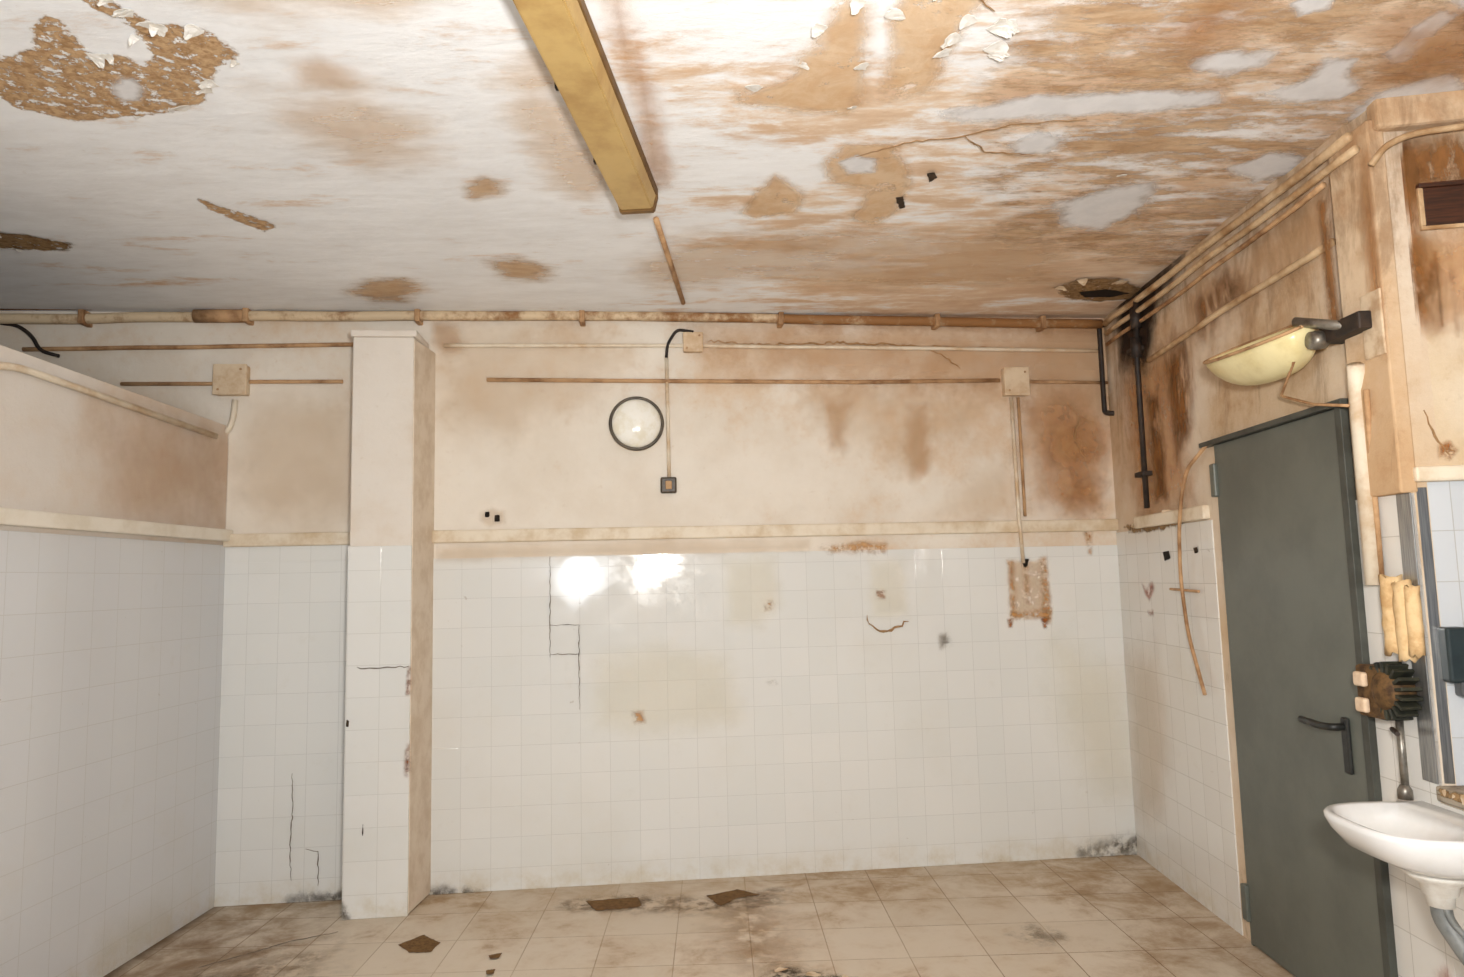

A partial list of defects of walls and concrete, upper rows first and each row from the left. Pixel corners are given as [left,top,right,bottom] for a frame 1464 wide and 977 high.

peeling [0,0,240,121]
peeling [741,0,869,112]
peeling [0,232,71,252]
peeling [744,177,800,217]
peeling [826,145,910,224]
peeling [884,0,1464,265]
water stain [1401,138,1464,321]
water stain [1036,403,1099,498]
water stain [1129,346,1188,502]